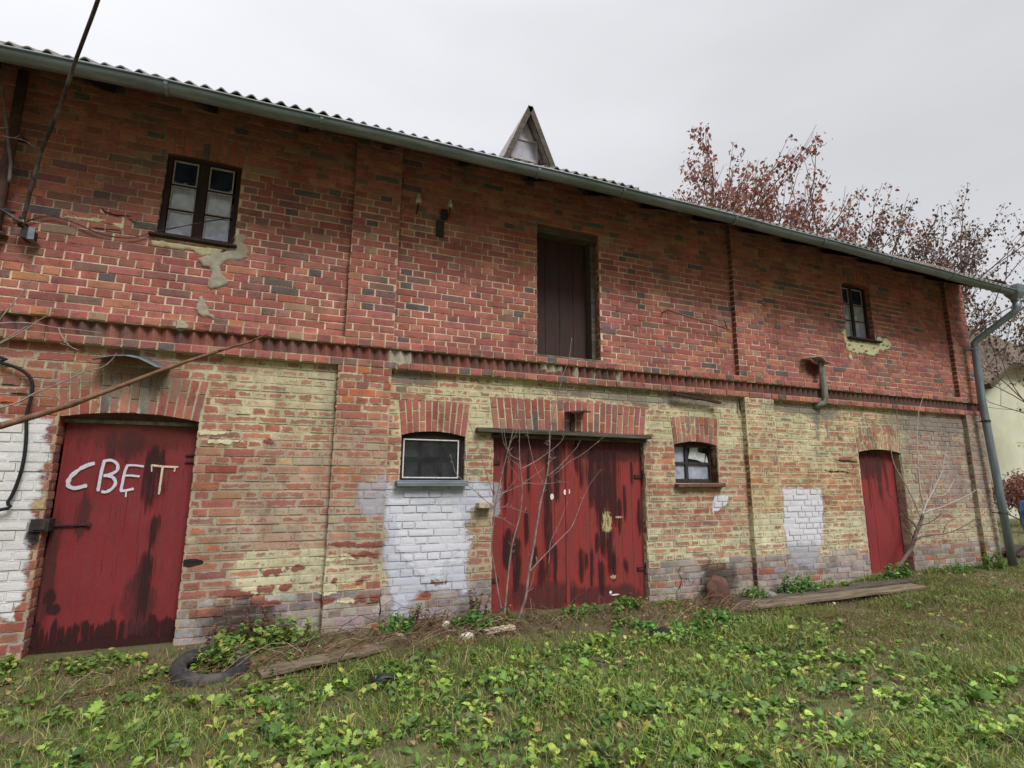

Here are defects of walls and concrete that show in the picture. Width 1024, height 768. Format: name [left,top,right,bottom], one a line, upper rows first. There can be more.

peeling [0,601,15,622]
peeling [43,589,61,615]